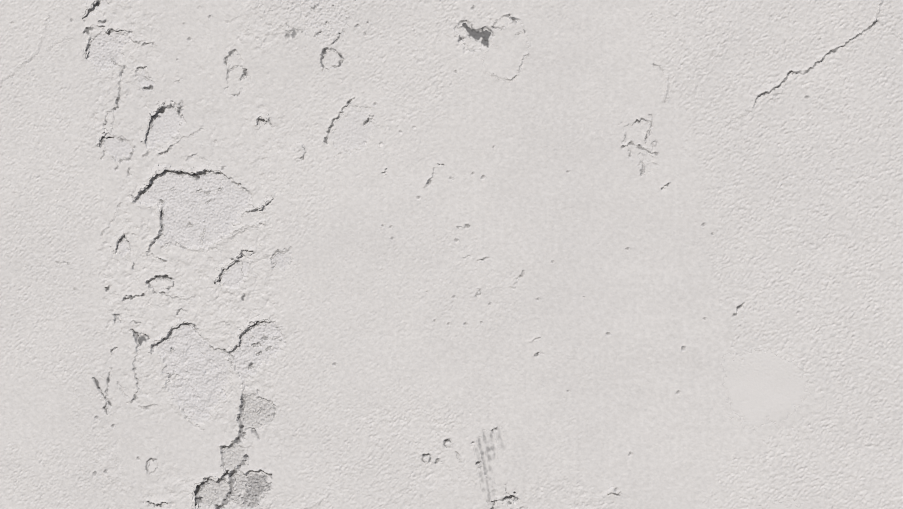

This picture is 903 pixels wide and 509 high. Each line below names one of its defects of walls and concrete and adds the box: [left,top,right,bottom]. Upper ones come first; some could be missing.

spalling [78,0,152,74]
peeling [135,66,156,94]
spalling [453,20,495,54]
crack [725,0,903,127]
spalling [95,100,293,302]
spalling [92,308,287,509]
crack [491,483,529,509]